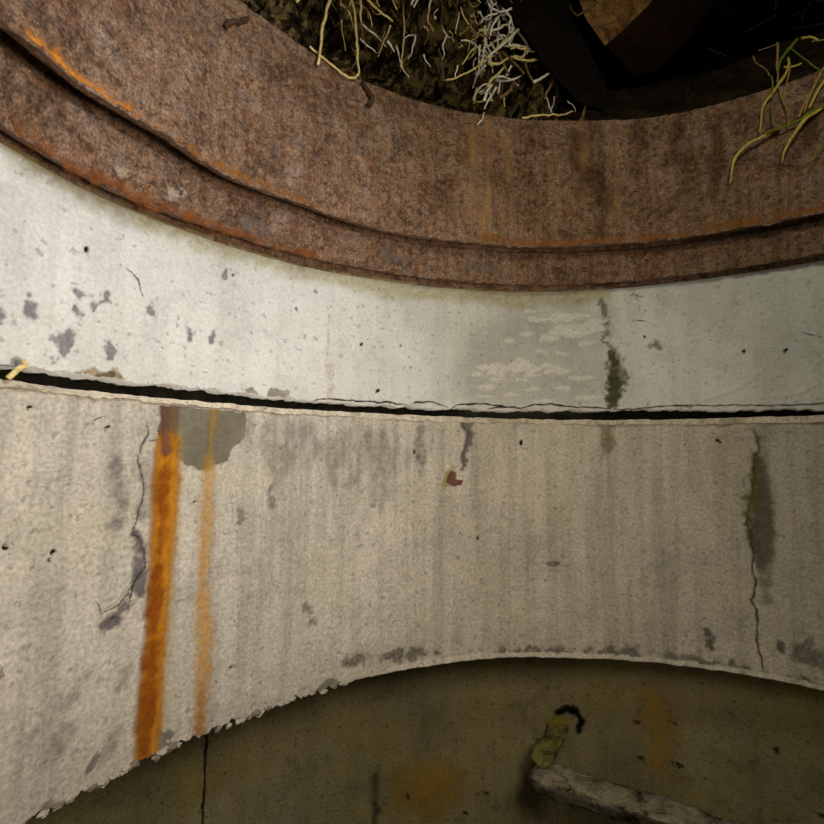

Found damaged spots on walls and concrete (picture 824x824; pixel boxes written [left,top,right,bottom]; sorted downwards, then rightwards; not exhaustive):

corrosion [25,31,161,127]
corrosion [44,148,172,212]
crack [96,426,155,630]
corrosion [136,406,179,761]
leakage [159,405,246,470]
corrosion [195,460,212,736]
crack [742,435,774,666]